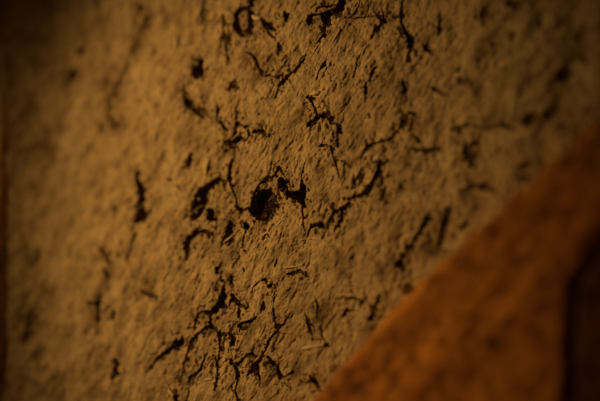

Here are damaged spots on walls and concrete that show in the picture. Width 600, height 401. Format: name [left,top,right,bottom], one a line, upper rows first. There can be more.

crack [182,84,206,119]
crack [245,50,307,99]
crack [305,0,416,178]
crack [430,86,449,96]
crack [222,95,272,212]
crack [274,160,391,244]
crack [274,258,309,278]
crack [142,289,158,299]
crack [335,294,381,322]
crack [146,286,322,401]